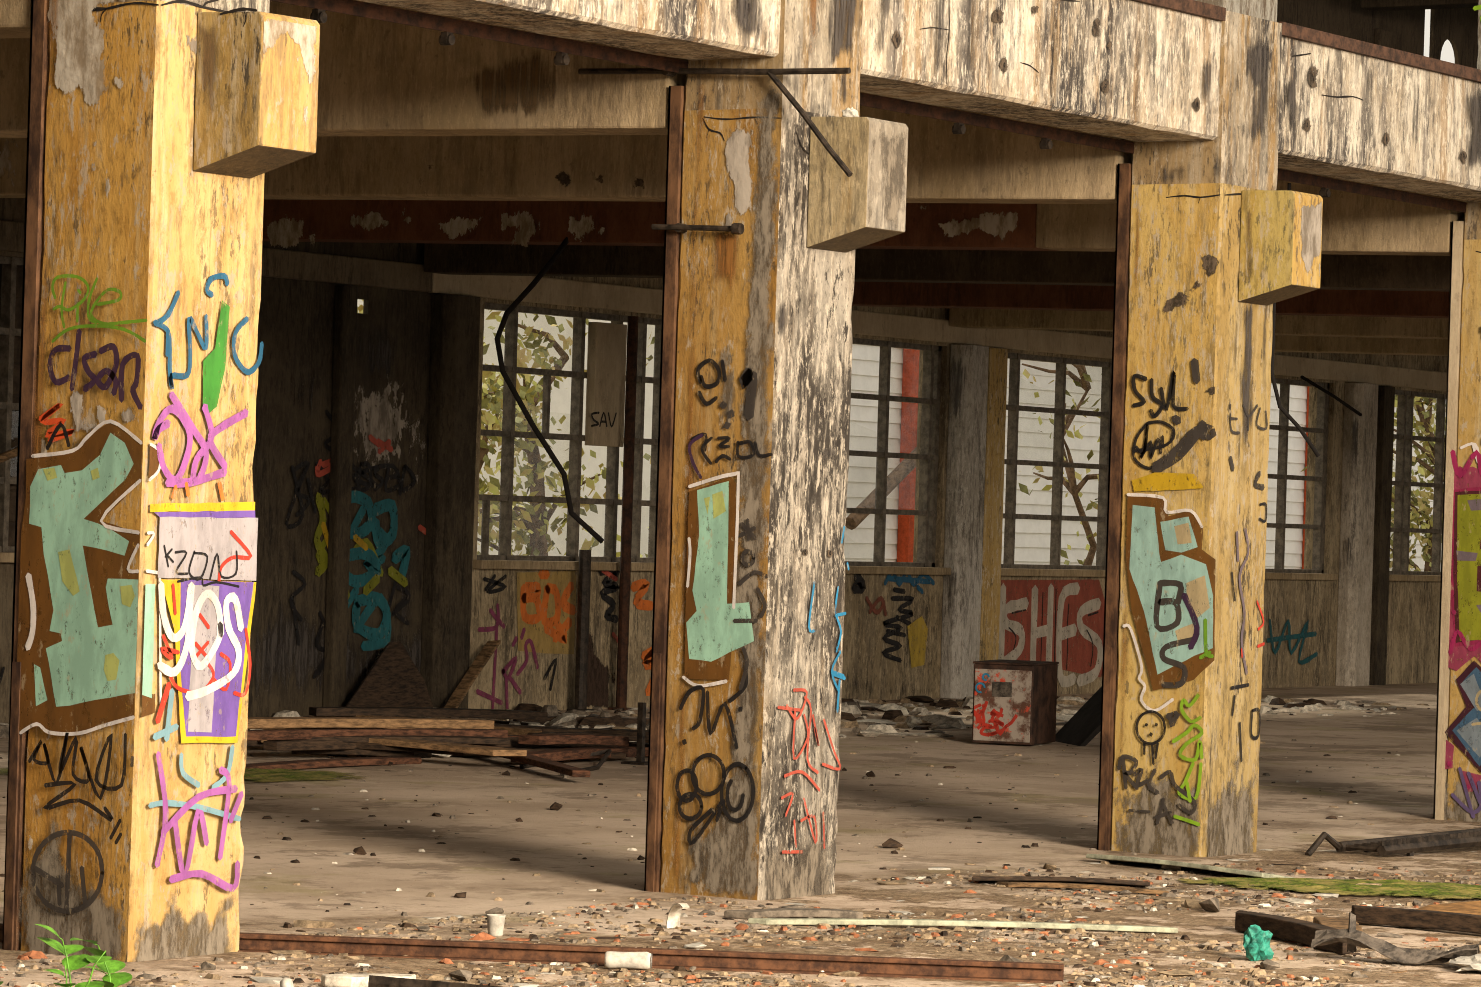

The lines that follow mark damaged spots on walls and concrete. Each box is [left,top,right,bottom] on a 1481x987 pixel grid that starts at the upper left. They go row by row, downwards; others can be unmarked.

peeling [47,0,125,106]
peeling [263,19,317,86]
damp [735,0,762,34]
damp [881,0,890,51]
damp [937,0,945,69]
damp [1204,60,1217,99]
damp [1470,94,1481,166]
peeling [725,128,756,226]
damp [685,86,832,900]